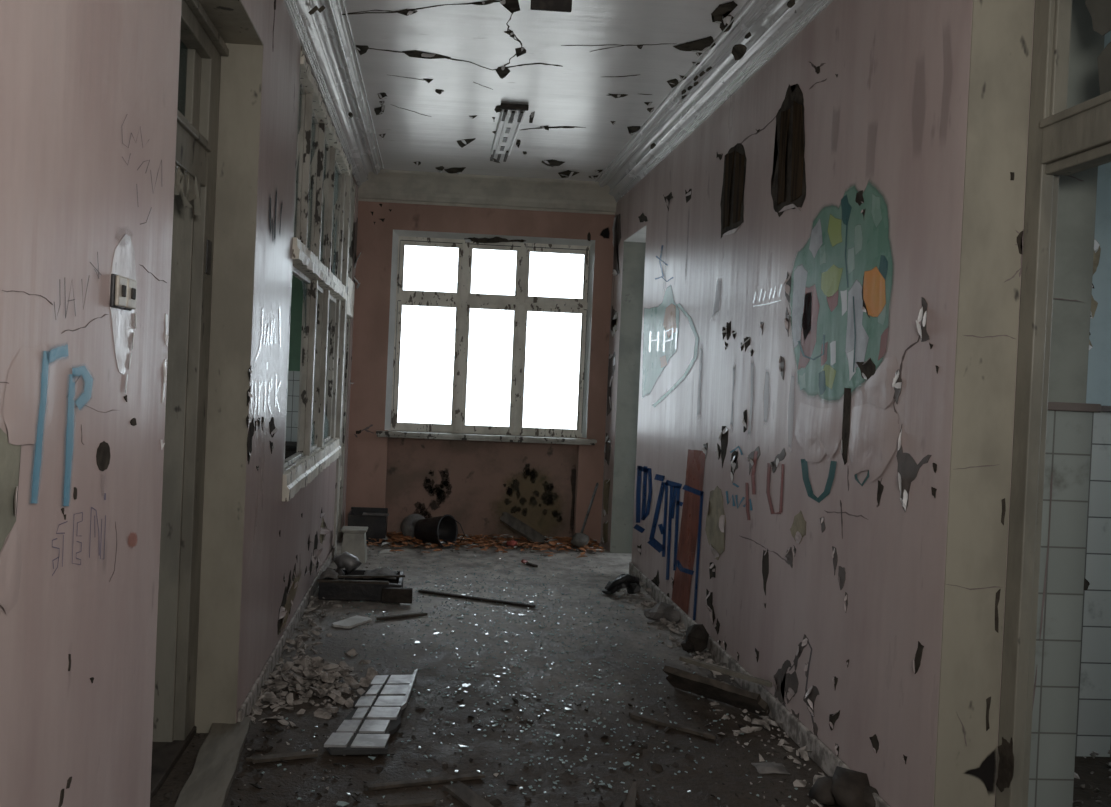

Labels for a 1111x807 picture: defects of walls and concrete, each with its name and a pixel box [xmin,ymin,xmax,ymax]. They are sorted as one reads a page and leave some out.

crack [342,0,677,117]
peeling [667,1,738,99]
crack [521,124,586,132]
crack [717,116,776,160]
peeling [109,234,136,402]
mould [413,469,452,518]
water stain [498,464,562,534]
peeling [278,509,330,634]
peeling [773,634,840,756]